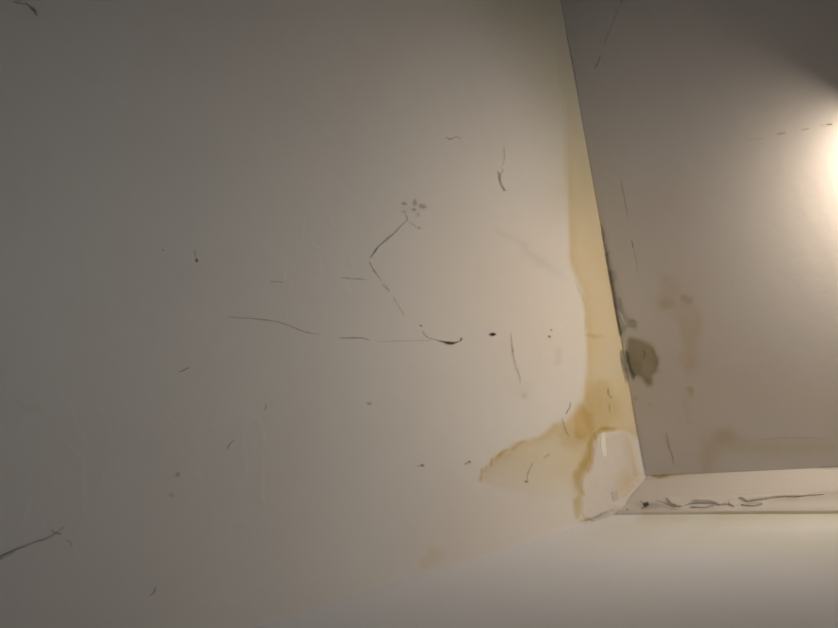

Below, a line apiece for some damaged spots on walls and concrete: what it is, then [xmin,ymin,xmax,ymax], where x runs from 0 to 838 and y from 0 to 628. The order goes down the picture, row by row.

peeling [580,432,639,522]